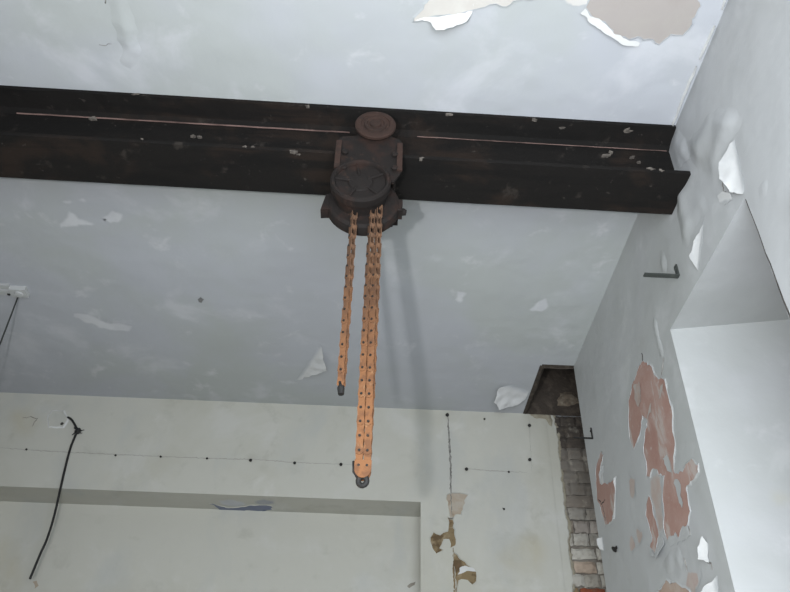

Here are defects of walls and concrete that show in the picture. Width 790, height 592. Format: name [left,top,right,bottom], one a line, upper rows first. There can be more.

peeling [411,0,536,30]
peeling [561,0,702,46]
peeling [717,140,744,205]
peeling [295,345,327,382]
peeling [494,385,530,410]
peeling [628,354,700,558]
flaking render [530,414,616,592]
flaking render [429,492,477,592]
peeling [658,536,718,592]